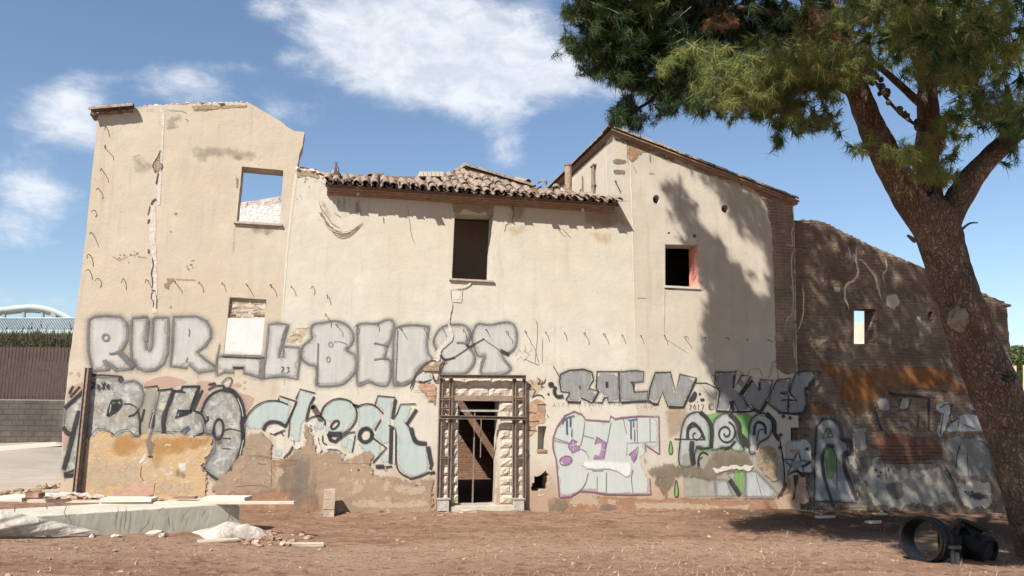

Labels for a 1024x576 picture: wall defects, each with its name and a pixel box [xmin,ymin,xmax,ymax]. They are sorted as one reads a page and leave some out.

crack [147,109,165,314]
crack [430,282,472,365]
crack [834,247,921,322]
flaking render [410,360,446,404]
flaking render [526,378,549,461]
peeling [80,422,435,514]